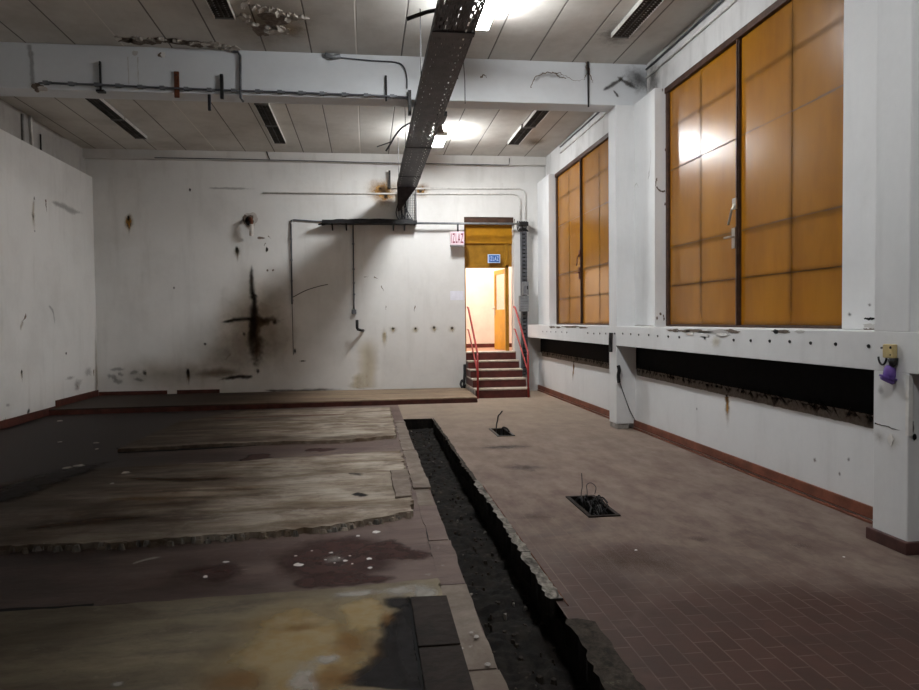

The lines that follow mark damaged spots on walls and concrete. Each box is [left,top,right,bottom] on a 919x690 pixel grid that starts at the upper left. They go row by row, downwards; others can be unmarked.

peeling [237,0,310,36]
corrosion [372,183,393,202]
water stain [205,269,276,379]
spalling [656,312,740,337]